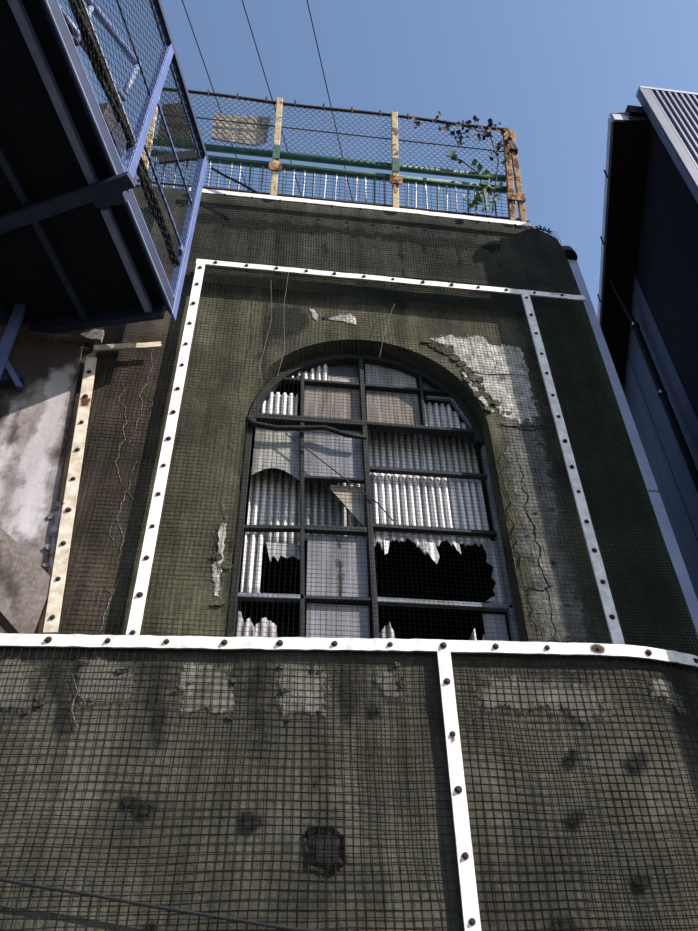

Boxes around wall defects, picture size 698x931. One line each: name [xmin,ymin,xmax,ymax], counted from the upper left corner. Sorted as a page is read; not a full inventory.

spalling [310,309,356,324]
leakage [0,336,86,539]
flaking render [421,334,589,643]
flaking render [210,503,233,607]
spalling [473,675,619,723]
spalling [650,676,687,716]
spalling [304,827,347,871]